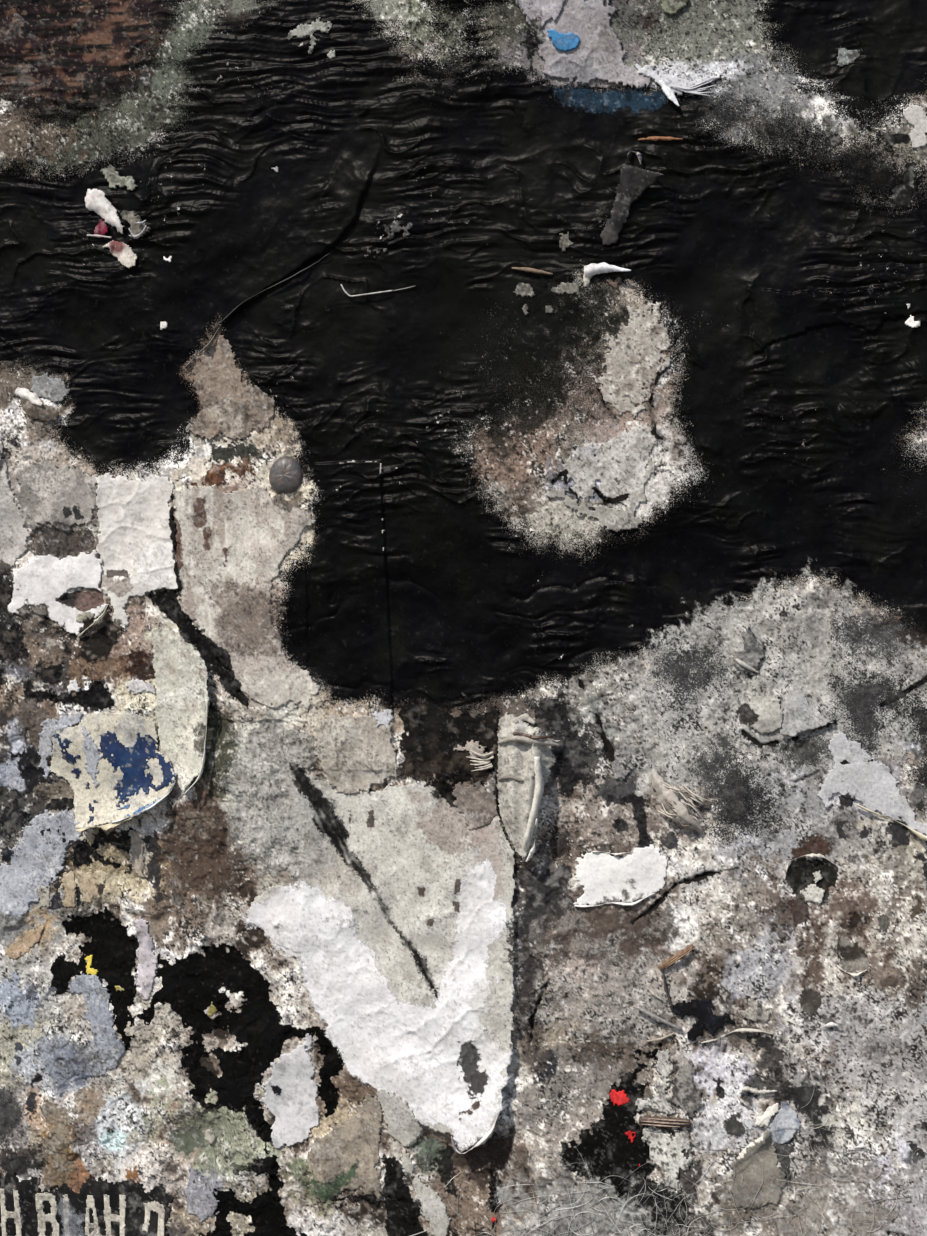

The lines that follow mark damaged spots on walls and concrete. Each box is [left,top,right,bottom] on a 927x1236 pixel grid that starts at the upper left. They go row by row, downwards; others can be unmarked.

peeling [515,0,651,89]
peeling [0,442,399,795]
peeling [452,780,498,830]
peeling [573,844,667,905]
crack [632,871,720,925]
peeling [259,1033,451,1236]